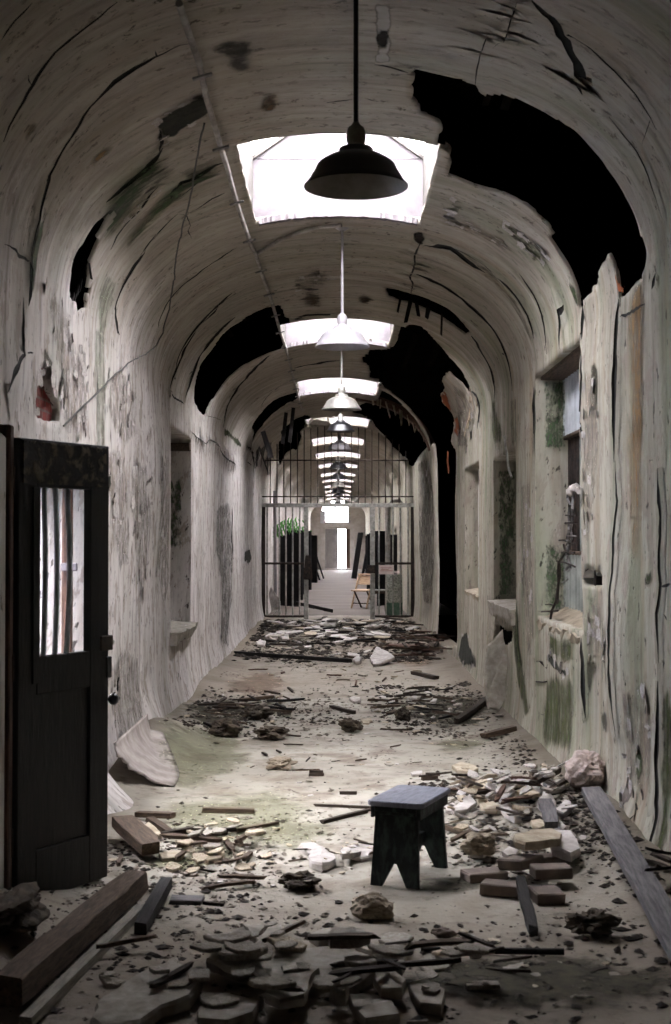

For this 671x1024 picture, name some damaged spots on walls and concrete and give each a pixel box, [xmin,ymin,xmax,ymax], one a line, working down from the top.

peeling [22,285,169,600]
crack [5,39,190,420]
spalling [290,339,319,348]
crack [392,238,659,738]
peeling [502,219,551,266]
crack [445,0,666,231]
damp [587,661,596,690]